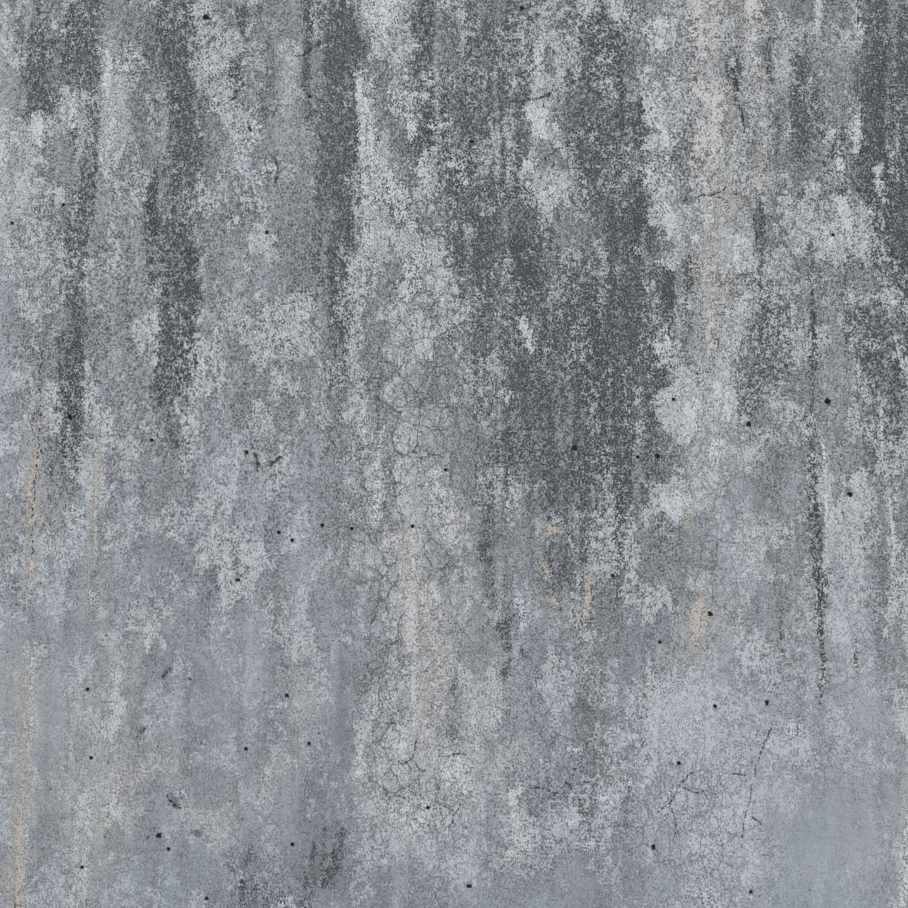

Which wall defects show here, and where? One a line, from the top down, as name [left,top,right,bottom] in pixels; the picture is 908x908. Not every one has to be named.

water stain [236,7,248,42]
water stain [0,0,144,479]
water stain [144,0,203,409]
water stain [302,0,792,582]
water stain [790,55,823,158]
water stain [815,0,908,304]
water stain [845,309,905,468]
water stain [301,833,345,888]
crack [657,724,773,848]